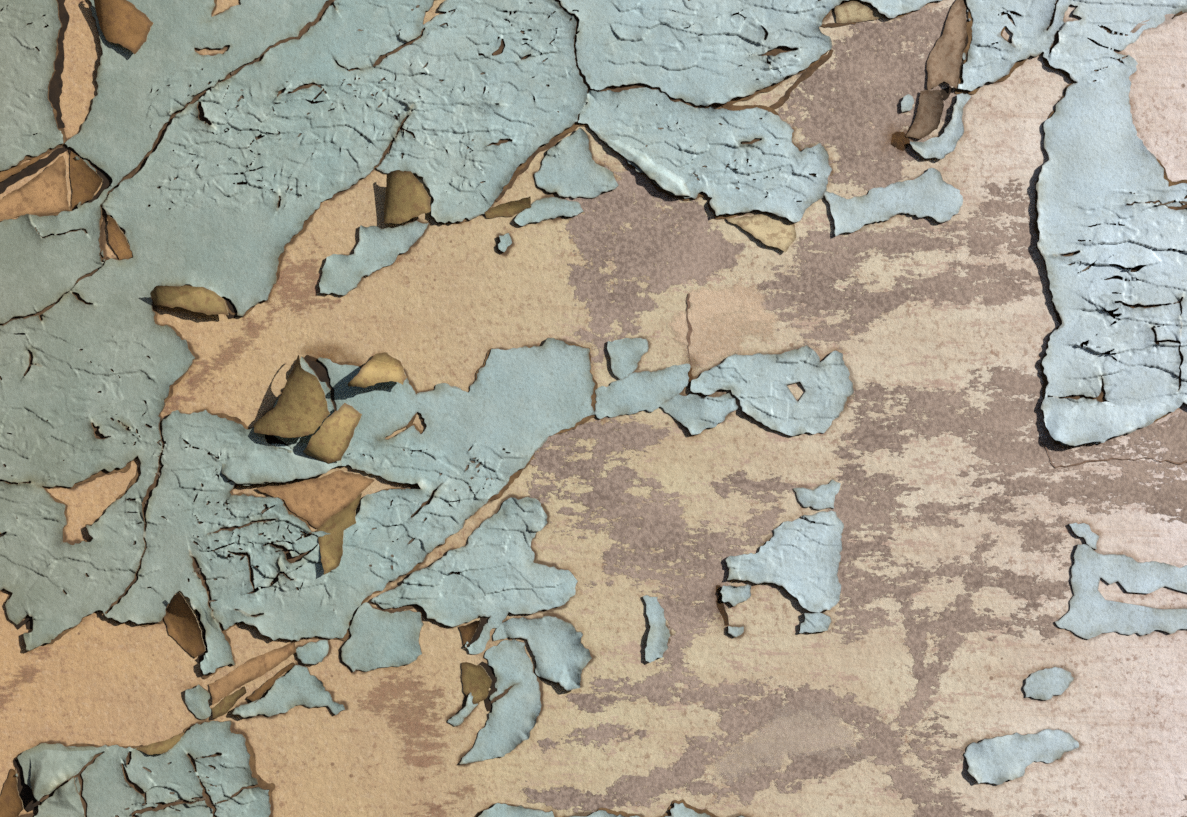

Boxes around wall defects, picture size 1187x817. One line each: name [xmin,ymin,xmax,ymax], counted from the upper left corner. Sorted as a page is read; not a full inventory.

peeling [0,0,153,262]
crack [0,0,336,326]
crack [255,0,856,202]
peeling [707,0,919,199]
peeling [855,0,1077,245]
peeling [1111,7,1187,192]
crack [1112,287,1183,390]
crack [80,349,166,613]
crack [188,452,318,617]
peeling [150,122,1187,817]
peeling [0,589,222,817]
crack [19,745,259,817]